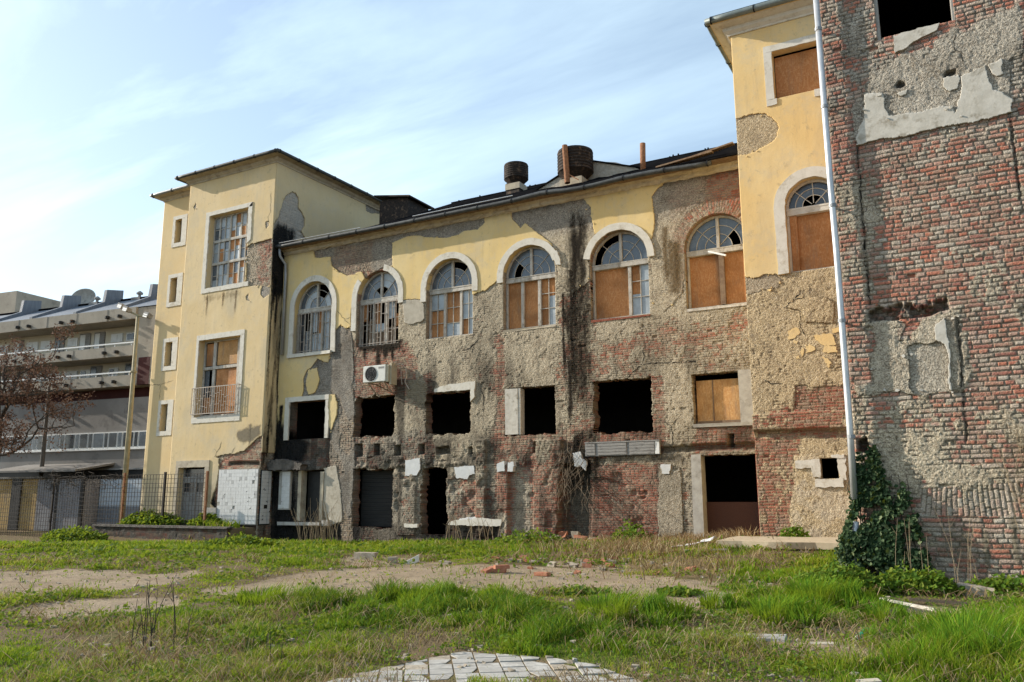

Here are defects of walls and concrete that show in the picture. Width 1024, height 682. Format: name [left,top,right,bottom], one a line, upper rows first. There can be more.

flaking render [850,0,1024,144]
flaking render [736,113,779,157]
flaking render [246,192,304,302]
flaking render [314,218,485,276]
flaking render [509,199,595,294]
flaking render [650,169,742,312]
leakage [562,214,594,417]
flaking render [788,297,971,410]
flaking render [211,436,264,508]
flaking render [310,325,361,541]